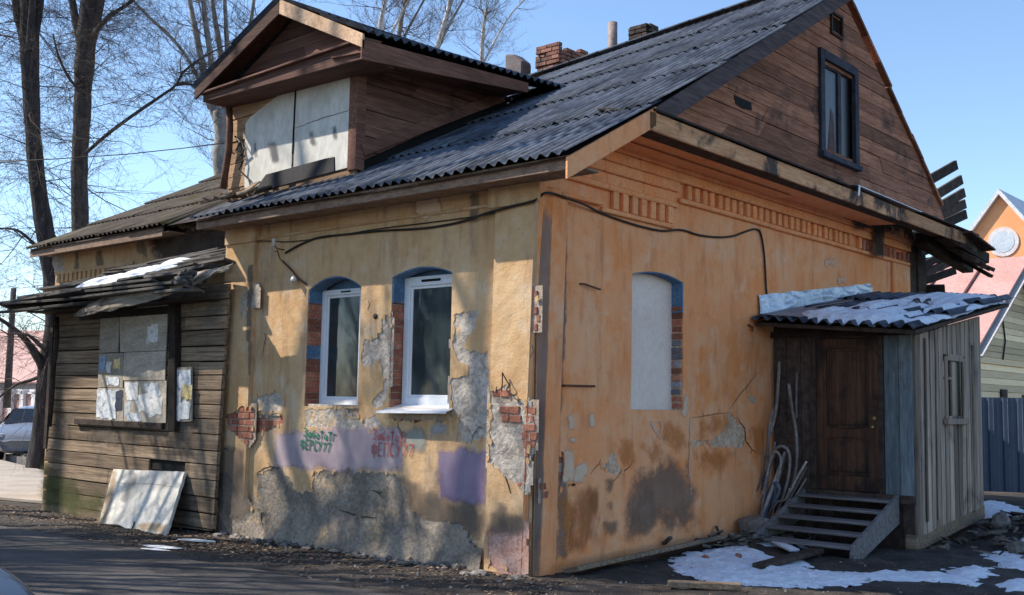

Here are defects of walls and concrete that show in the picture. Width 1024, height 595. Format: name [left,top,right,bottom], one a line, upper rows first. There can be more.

spalling [225,389,284,448]
flaking render [305,312,394,434]
flaking render [437,311,624,503]
flaking render [693,412,746,450]
flaking render [216,473,262,536]
leakage [557,479,597,556]
leakage [628,417,695,537]